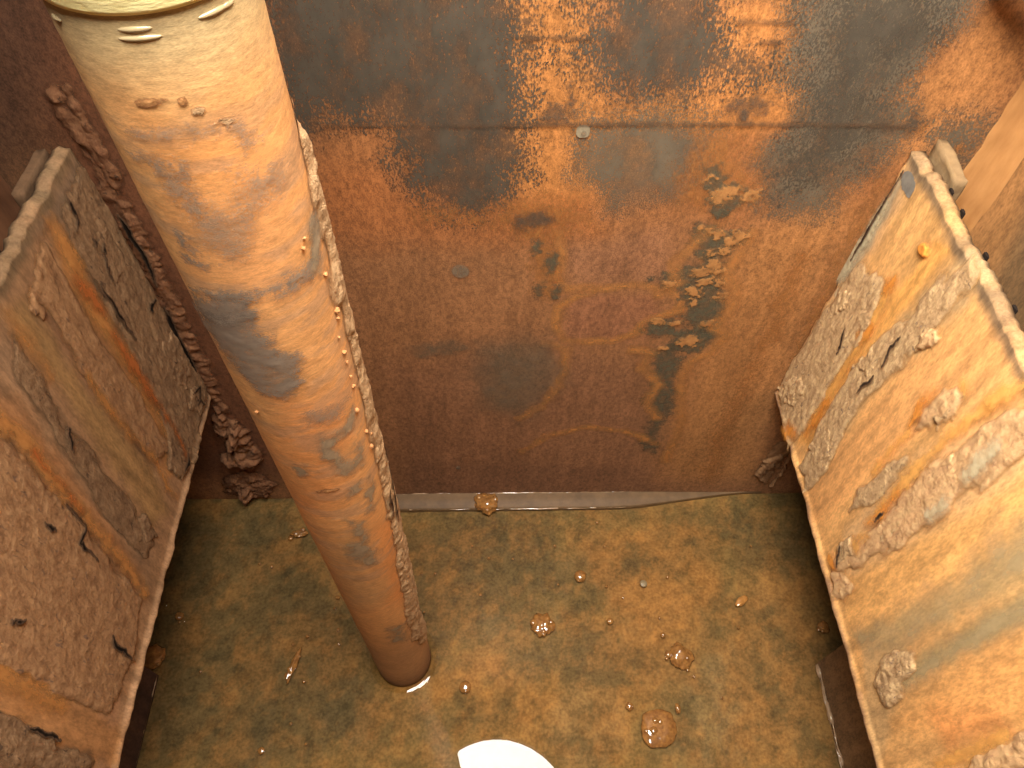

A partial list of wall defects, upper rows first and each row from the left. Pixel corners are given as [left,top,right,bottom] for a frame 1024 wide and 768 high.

rust [27,83,279,506]
leakage [126,150,285,271]
leakage [189,212,321,400]
rust [288,92,427,645]
leakage [265,0,1001,463]
crack [836,328,845,355]
rust [754,254,981,493]
crack [856,336,901,393]
crack [45,502,99,562]
rust [0,329,158,715]
rust [0,711,95,768]
crack [112,635,133,660]